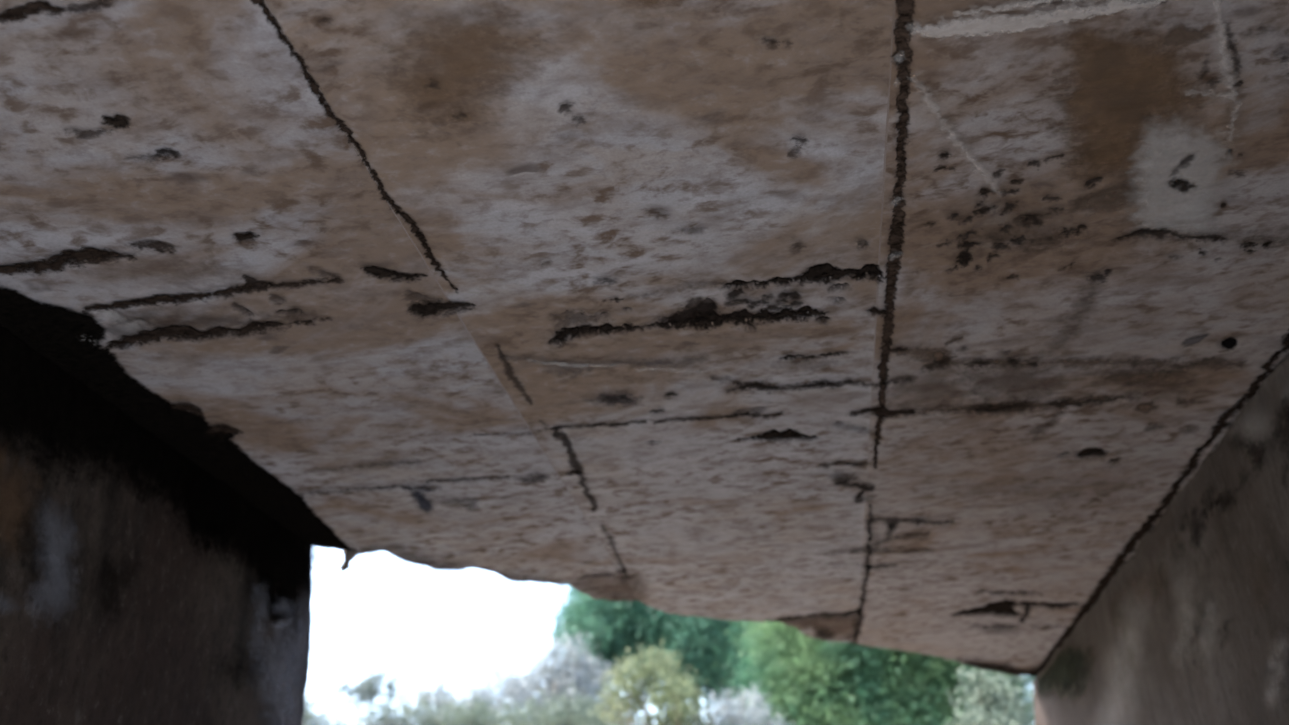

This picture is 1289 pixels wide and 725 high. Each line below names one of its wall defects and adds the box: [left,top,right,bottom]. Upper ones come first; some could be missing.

crack [0,241,174,276]
crack [83,275,342,350]
crack [817,460,868,468]